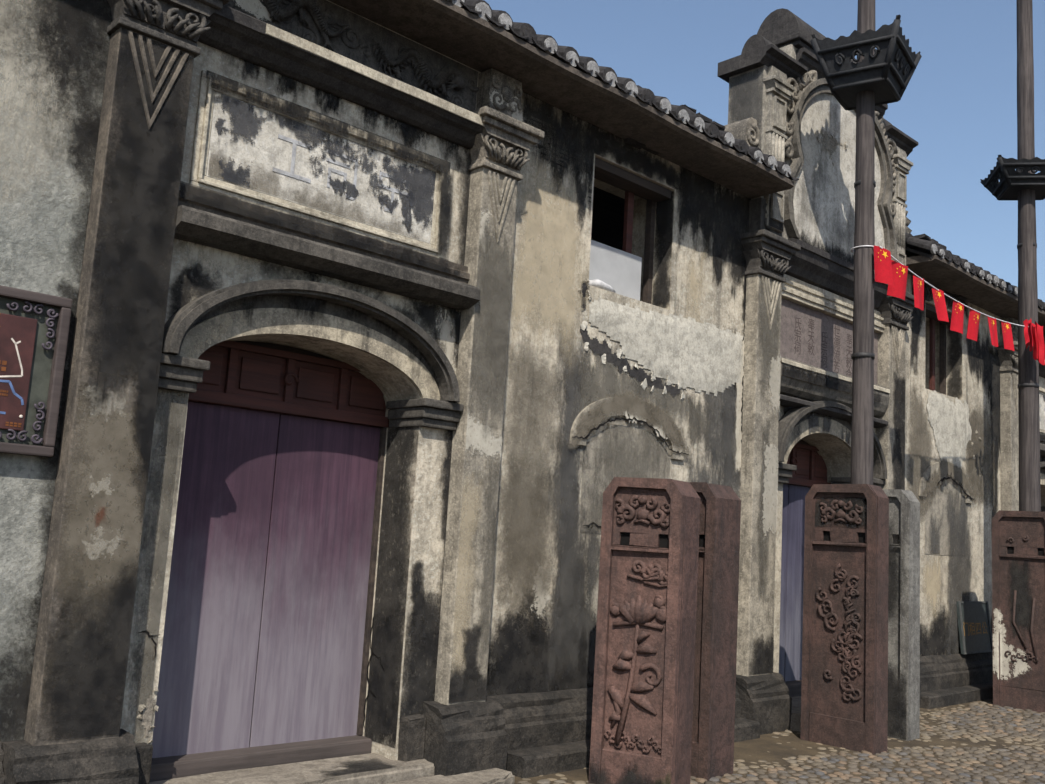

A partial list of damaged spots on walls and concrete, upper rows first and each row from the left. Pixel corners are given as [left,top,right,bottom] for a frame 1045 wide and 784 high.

leakage [729,69,763,126]
leakage [800,233,854,264]
leakage [0,0,472,748]
leakage [449,90,751,703]
peeling [578,279,685,399]
leakage [760,278,852,416]
leakage [758,423,779,596]
leakage [874,275,1001,657]
leakage [751,637,774,675]
leakage [887,663,907,740]
leakage [326,759,393,776]
leakage [590,765,661,784]